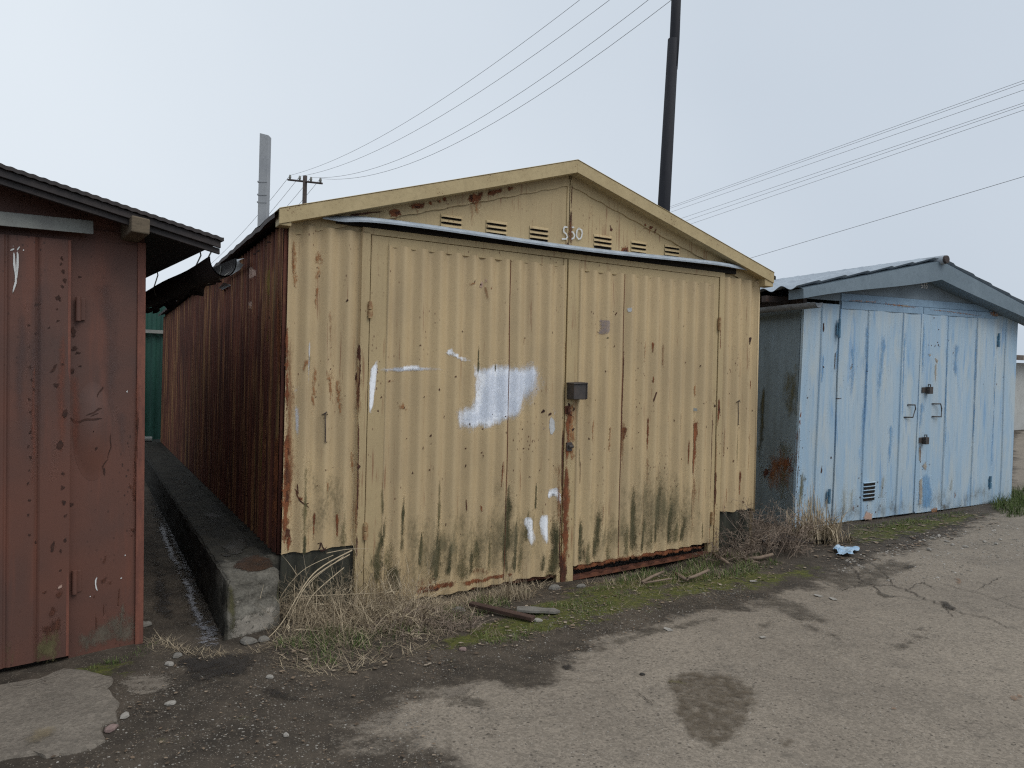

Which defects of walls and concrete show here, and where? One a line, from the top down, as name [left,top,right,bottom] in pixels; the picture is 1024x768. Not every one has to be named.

rust [469,187,513,211]
rust [282,328,361,550]
rust [417,570,512,594]
leakage [419,486,537,577]
leakage [541,523,560,572]
leakage [586,486,686,564]
rust [553,393,749,582]
leakage [669,673,753,747]